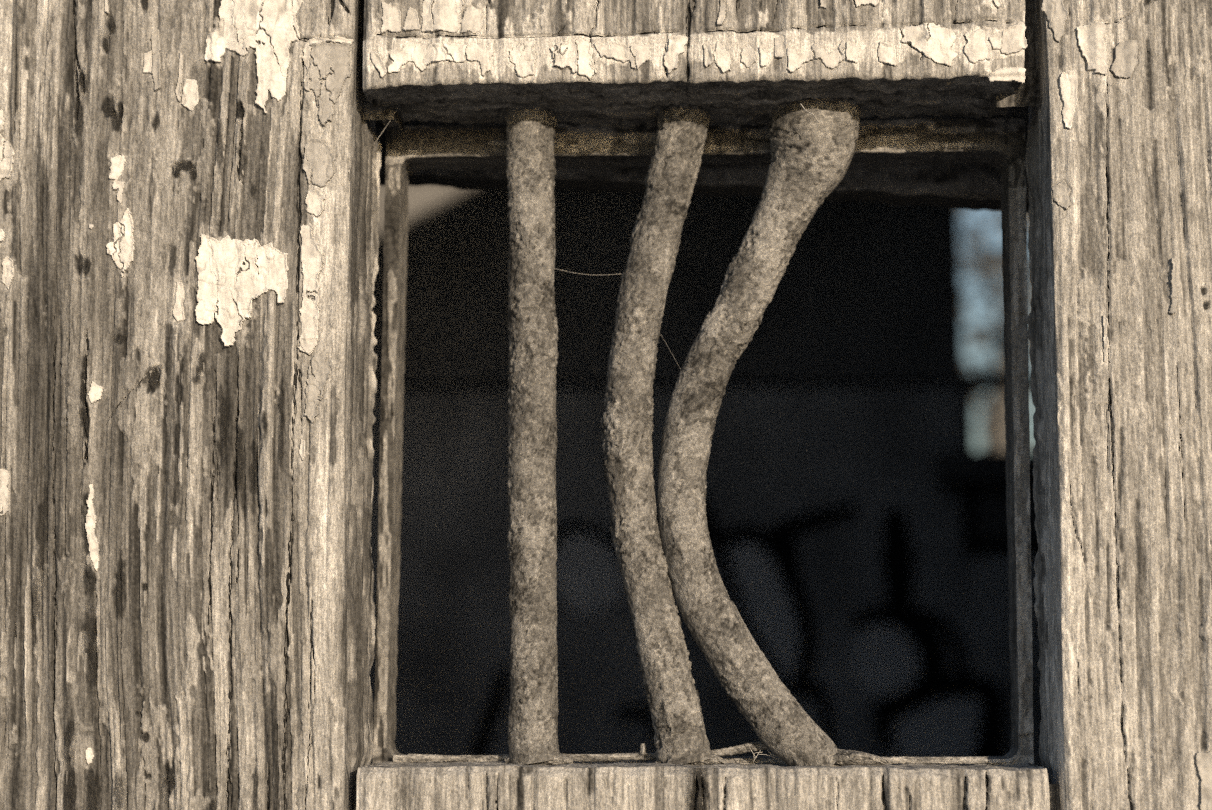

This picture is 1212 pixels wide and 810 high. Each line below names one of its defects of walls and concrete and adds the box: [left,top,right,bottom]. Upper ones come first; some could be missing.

peeling [371,0,493,78]
peeling [550,35,688,81]
crack [377,0,866,85]
peeling [878,21,1028,84]
crack [901,1,1010,60]
peeling [1041,0,1138,130]
peeling [106,155,135,277]
peeling [173,0,354,423]
crack [267,0,350,810]
crack [1106,83,1132,810]
crack [208,371,239,808]
crack [695,777,726,810]